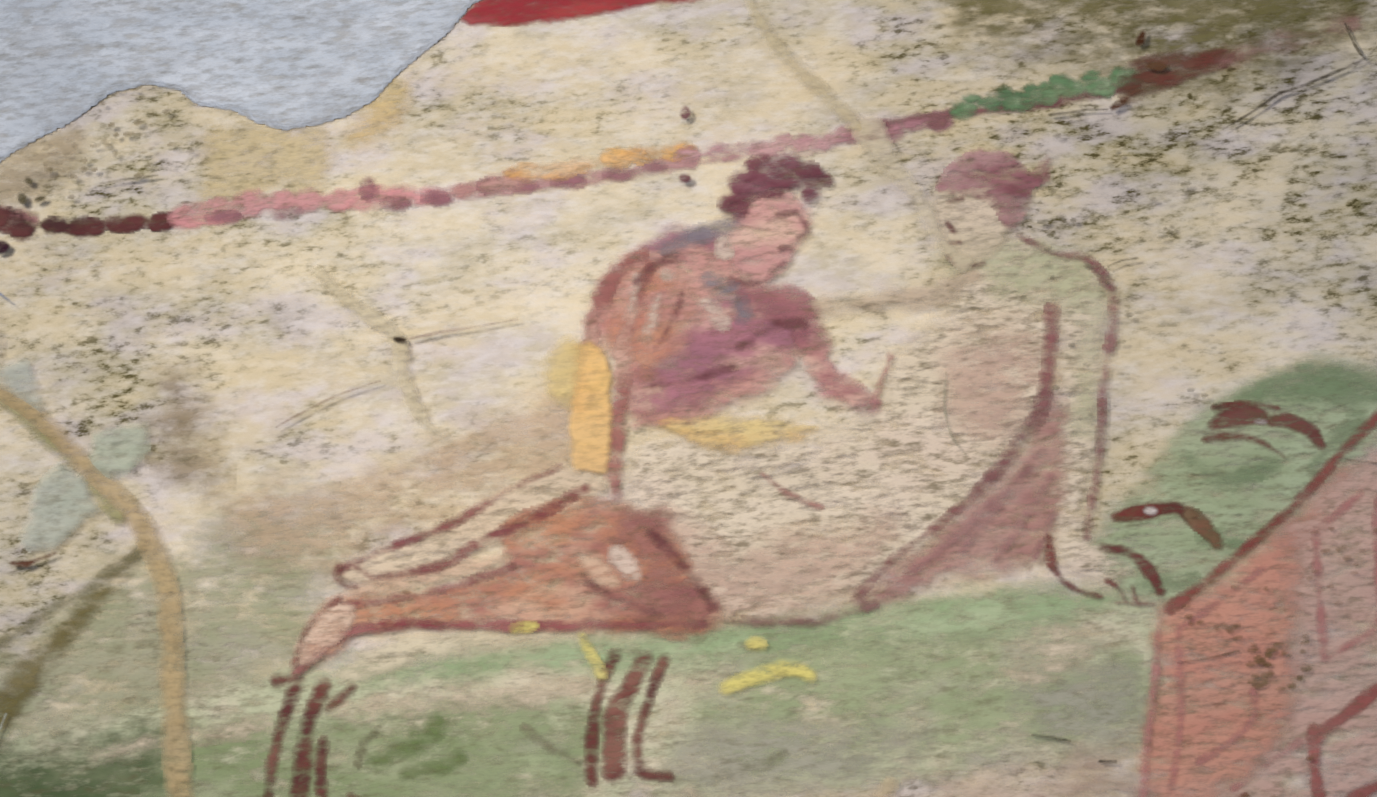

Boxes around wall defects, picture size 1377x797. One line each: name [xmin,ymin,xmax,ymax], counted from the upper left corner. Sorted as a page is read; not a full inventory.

crack [1231,23,1363,125]
spalling [18,178,45,204]